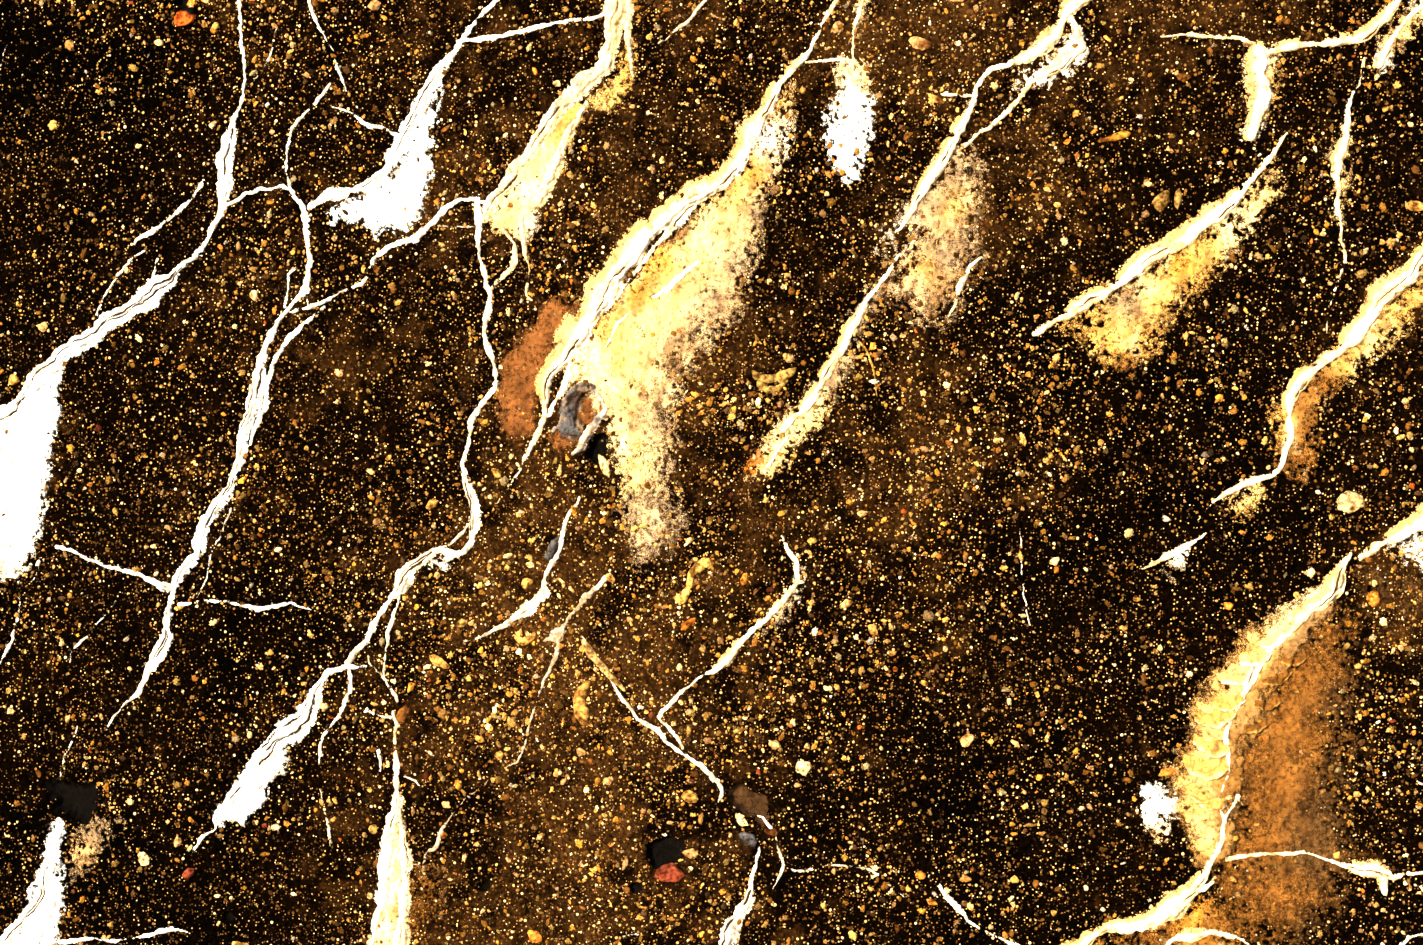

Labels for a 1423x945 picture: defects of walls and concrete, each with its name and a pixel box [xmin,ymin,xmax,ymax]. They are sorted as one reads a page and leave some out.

leakage [0,375,62,584]
leakage [326,84,444,240]
crack [0,0,864,945]
leakage [563,79,798,574]
leakage [821,0,876,184]
crack [763,0,1092,473]
crack [1032,0,1423,572]
leakage [13,812,126,945]
crack [719,815,904,945]
crack [938,884,1019,945]
leakage [1095,600,1369,945]
crack [1061,503,1423,945]